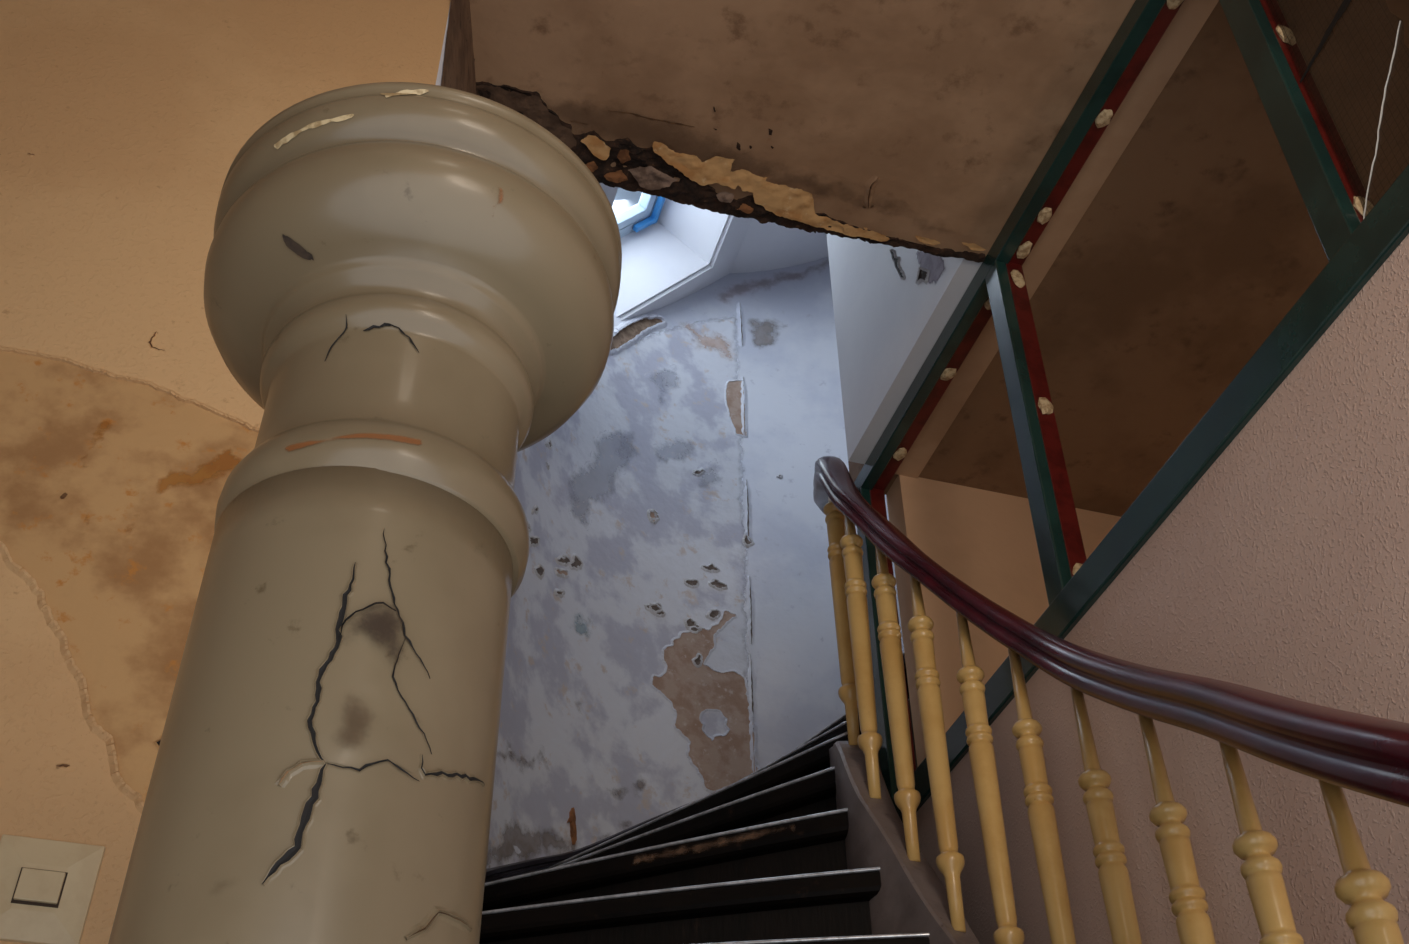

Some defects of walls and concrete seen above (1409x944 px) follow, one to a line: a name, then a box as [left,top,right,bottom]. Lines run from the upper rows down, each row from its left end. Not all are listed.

spalling [476,81,986,285]
peeling [0,346,260,814]
crack [259,531,485,887]
peeling [486,314,760,869]